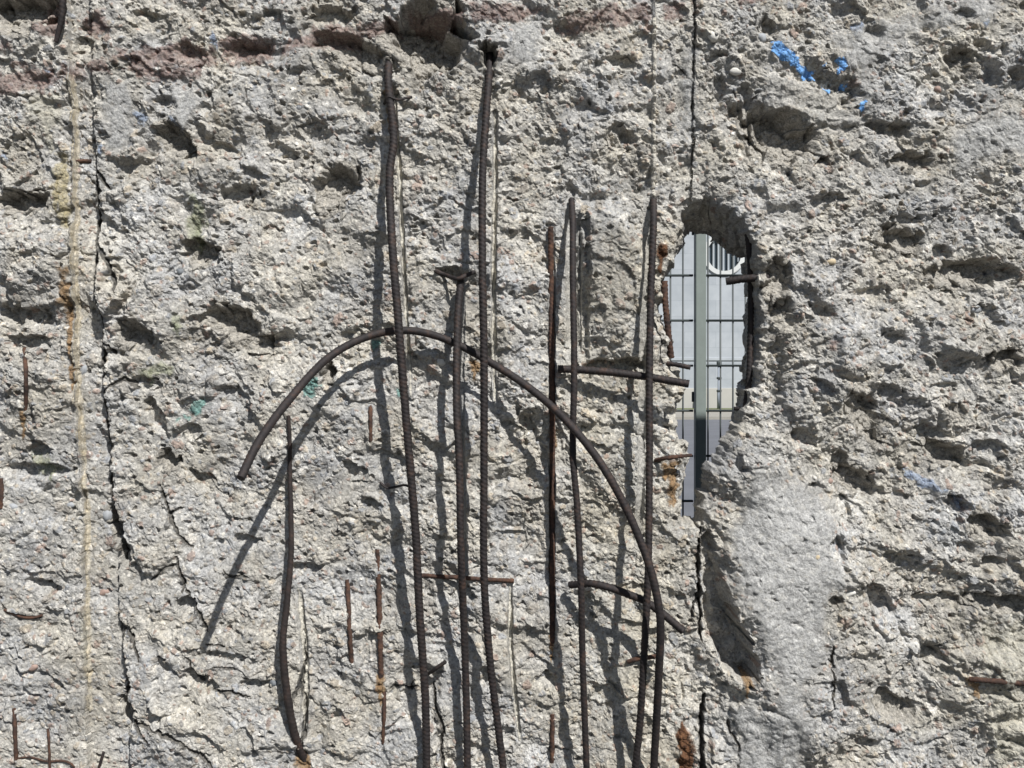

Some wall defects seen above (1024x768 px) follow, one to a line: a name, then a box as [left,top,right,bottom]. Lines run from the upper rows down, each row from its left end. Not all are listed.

crack [677,0,697,191]
spalling [296,160,361,225]
corrosion [656,243,668,274]
corrosion [55,267,77,390]
crack [93,117,141,504]
spalling [207,296,285,359]
spalling [303,362,337,398]
spalling [945,402,969,422]
corrosion [659,461,680,507]
crack [150,486,251,698]
crack [690,526,703,642]
corrosion [675,721,696,768]